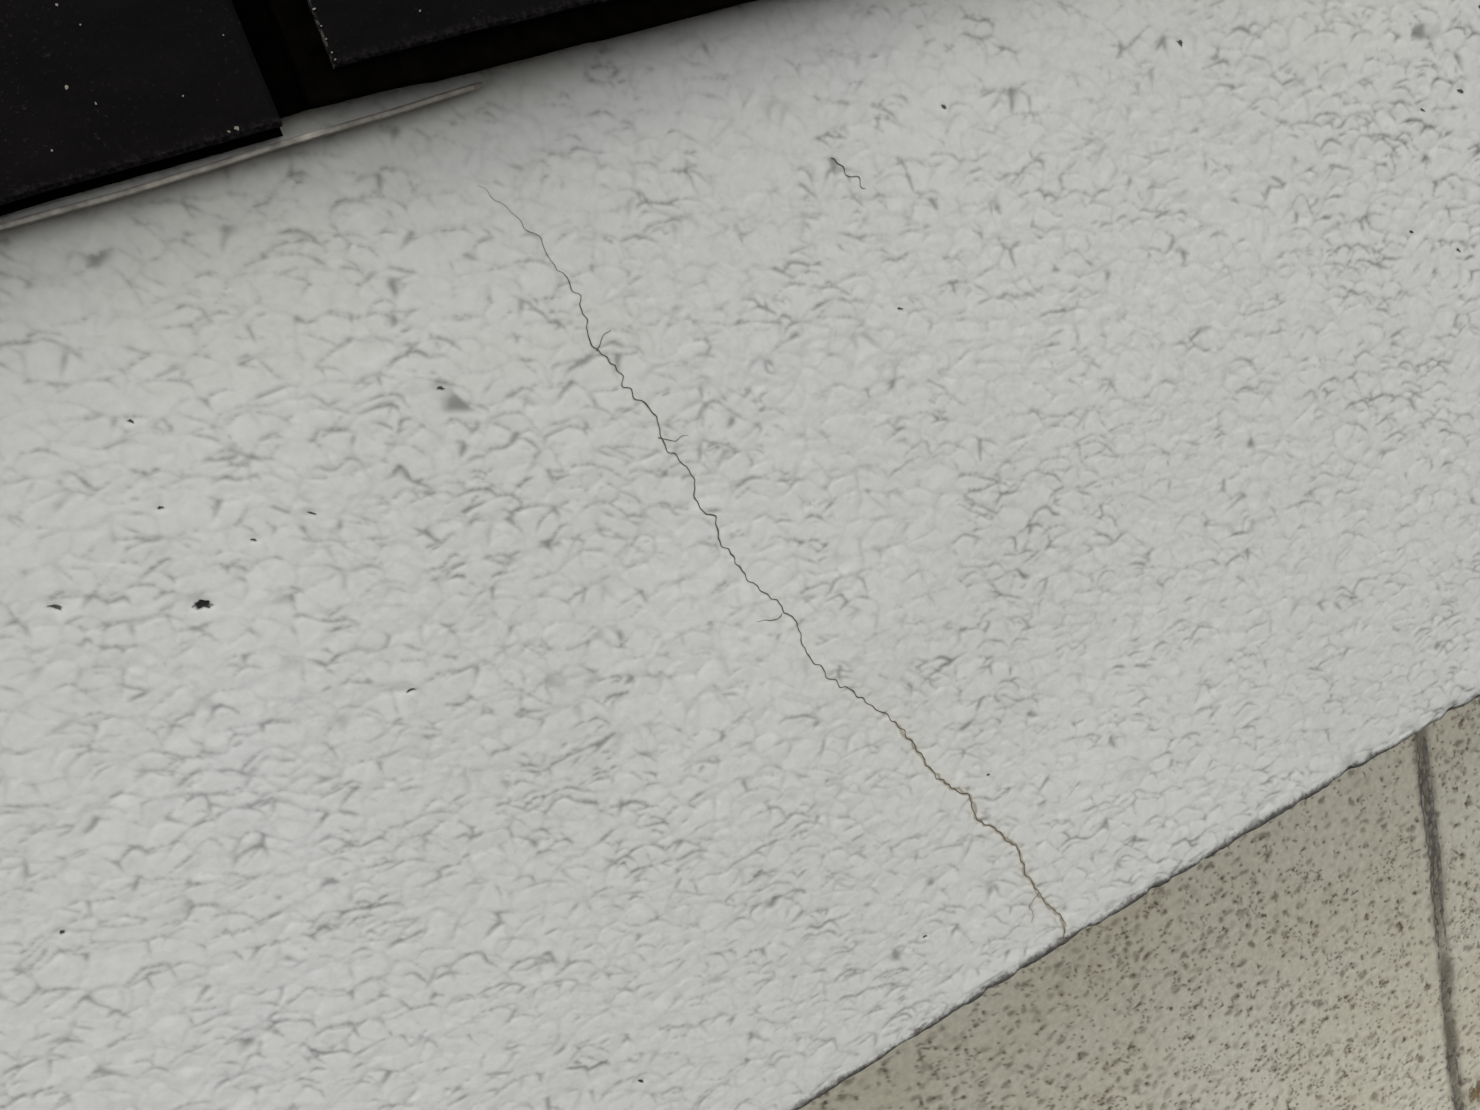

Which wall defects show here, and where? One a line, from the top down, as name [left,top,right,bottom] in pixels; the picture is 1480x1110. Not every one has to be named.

crack [478,185,1066,942]